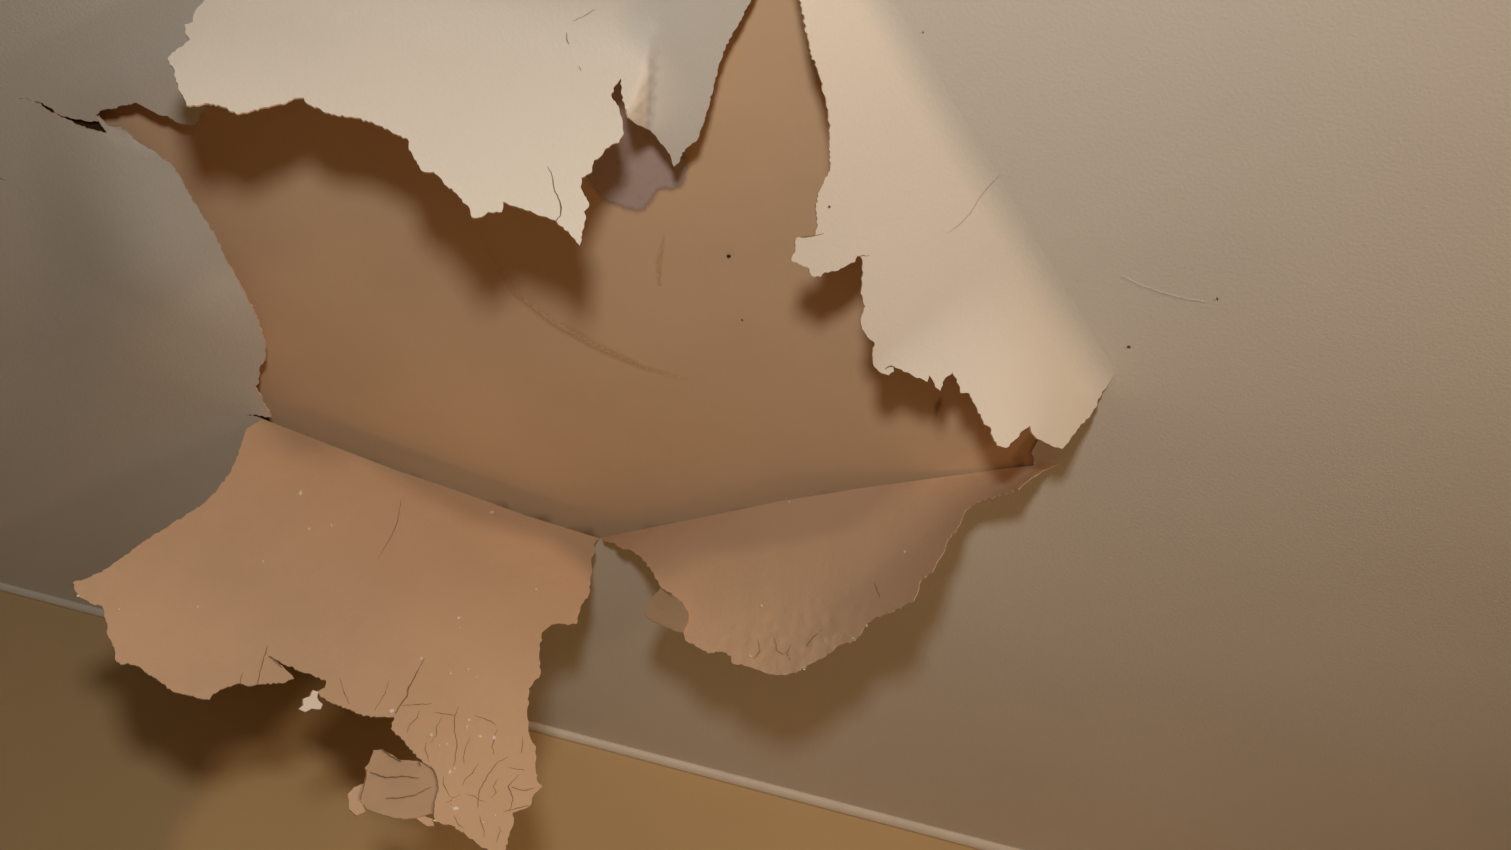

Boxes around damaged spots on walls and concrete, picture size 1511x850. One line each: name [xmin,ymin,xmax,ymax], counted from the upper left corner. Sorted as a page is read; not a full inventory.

crack [35,101,106,132]
flaking render [9,0,1116,850]